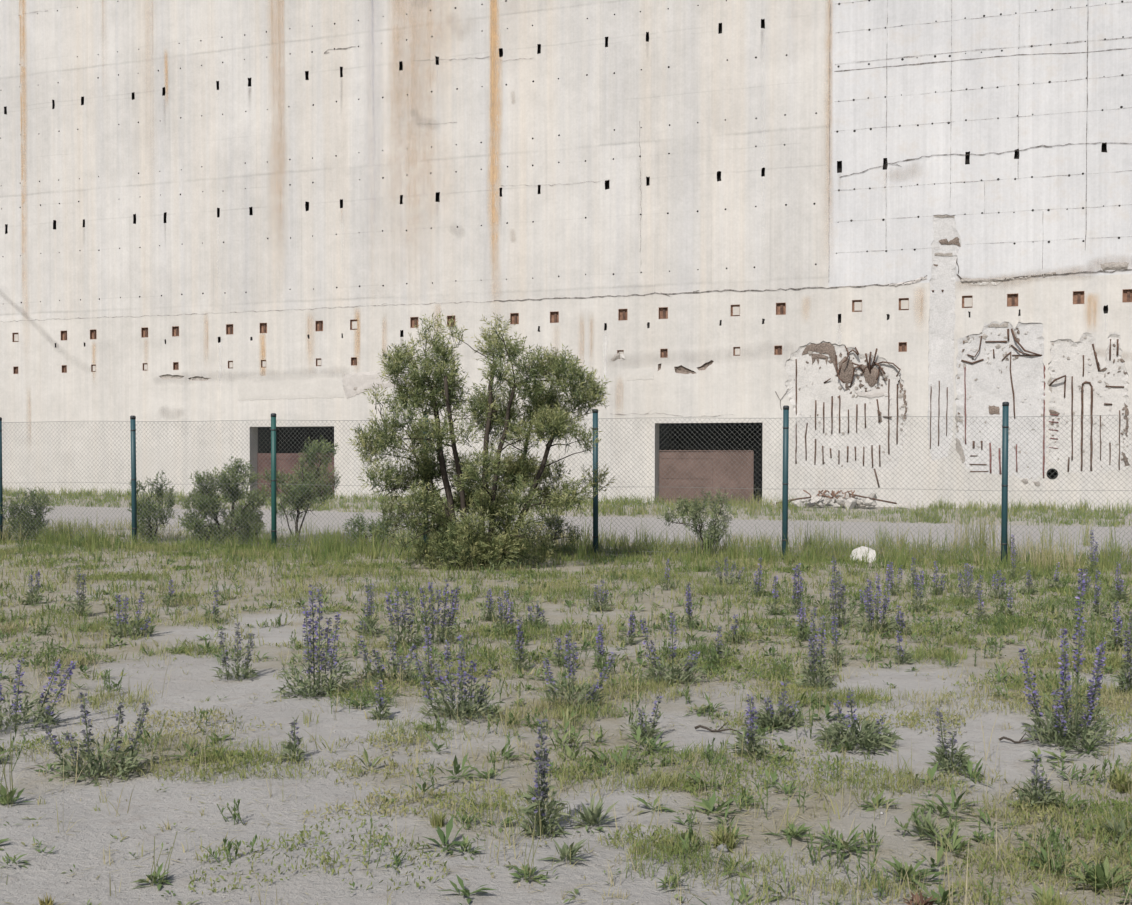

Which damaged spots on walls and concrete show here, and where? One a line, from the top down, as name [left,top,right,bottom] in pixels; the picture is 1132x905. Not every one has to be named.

corrosion [491,0,499,132]
crack [841,142,1132,177]
spalling [933,237,961,266]
spalling [785,341,909,488]
spalling [930,321,1132,486]